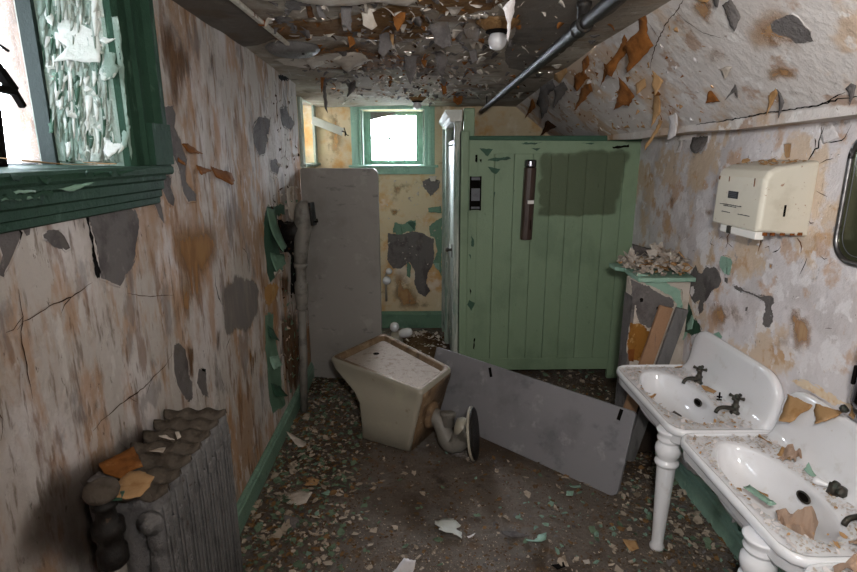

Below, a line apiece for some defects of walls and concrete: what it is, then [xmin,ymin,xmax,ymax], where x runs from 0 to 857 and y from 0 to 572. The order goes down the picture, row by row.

peeling [0,0,135,201]
spalling [264,0,709,154]
crack [697,92,857,197]
flaking render [0,228,30,277]
crack [6,283,91,398]
flaking render [86,209,140,288]
crack [93,353,173,431]
flaking render [172,343,209,402]
peeling [224,87,309,413]
flaking render [386,176,442,297]
peeling [629,255,775,340]
peeling [779,379,855,424]